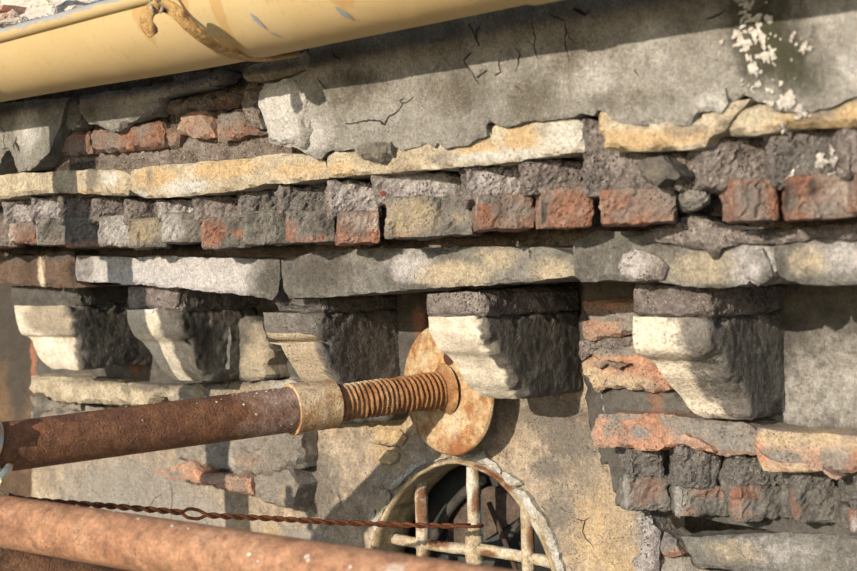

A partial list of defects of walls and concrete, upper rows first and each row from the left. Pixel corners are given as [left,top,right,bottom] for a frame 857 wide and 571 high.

crack [463,8,590,89]
water stain [728,0,814,89]
spalling [61,51,310,157]
crack [345,97,413,126]
peeling [672,88,733,126]
spalling [617,248,670,281]
flaking render [579,298,694,414]
spalling [671,434,718,452]
spalling [754,445,853,480]